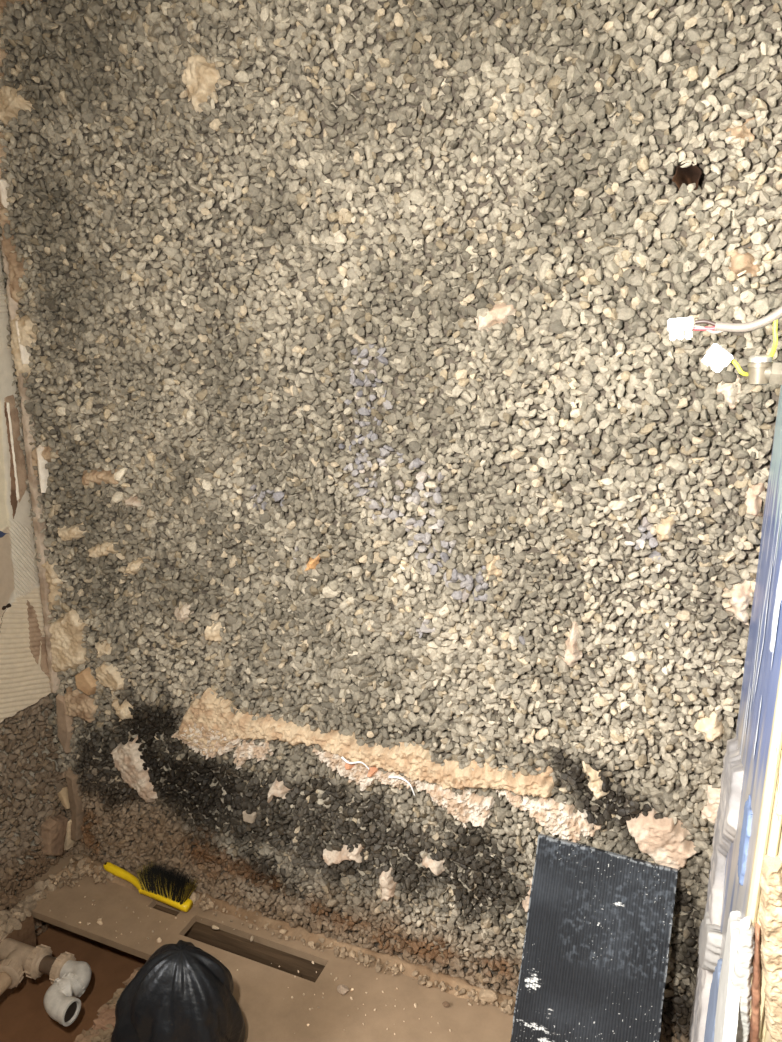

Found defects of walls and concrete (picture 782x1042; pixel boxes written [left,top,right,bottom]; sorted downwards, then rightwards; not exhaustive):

peeling [0,178,13,210]
flaking render [26,600,50,679]
peeling [745,510,782,759]
flaking render [41,694,85,856]
peeling [171,722,274,769]
flaking render [242,810,259,824]
leakage [75,697,515,916]
peeling [311,745,601,843]
leakage [553,751,660,844]
flaking render [738,795,753,886]
leakage [662,892,699,1034]
flaking render [698,854,782,1042]